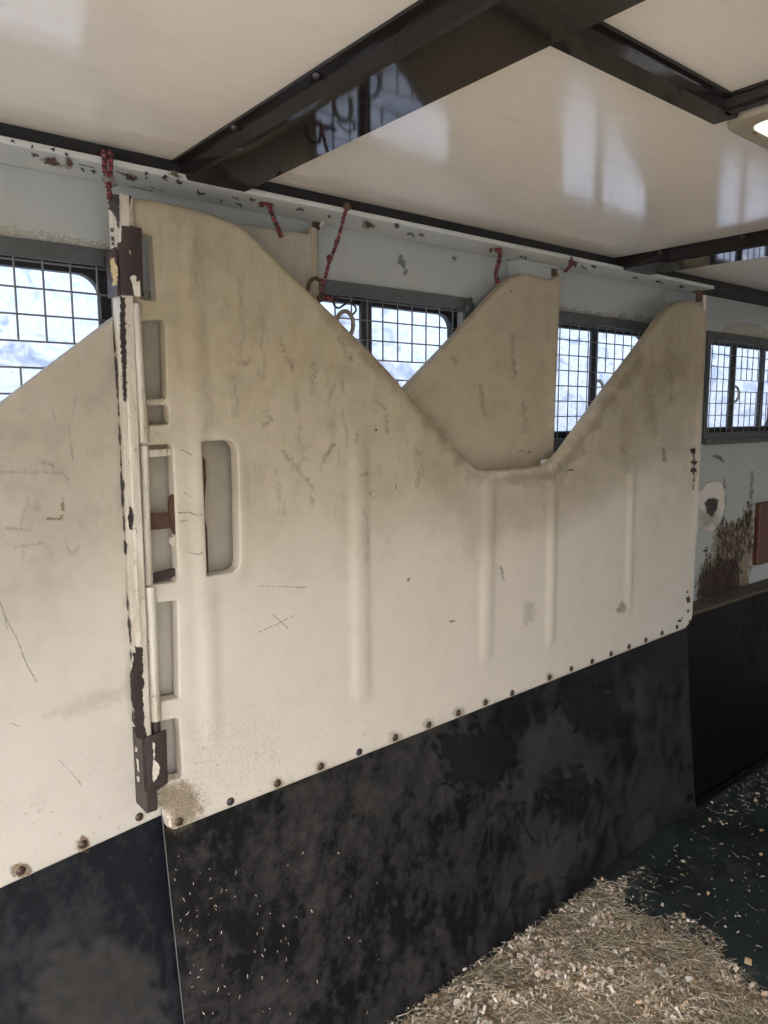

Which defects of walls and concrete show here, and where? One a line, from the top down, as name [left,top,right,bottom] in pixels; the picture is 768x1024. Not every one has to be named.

rust [31,144,96,174]
rust [116,171,182,192]
peeling [107,194,131,245]
peeling [112,275,141,555]
peeling [126,594,160,782]